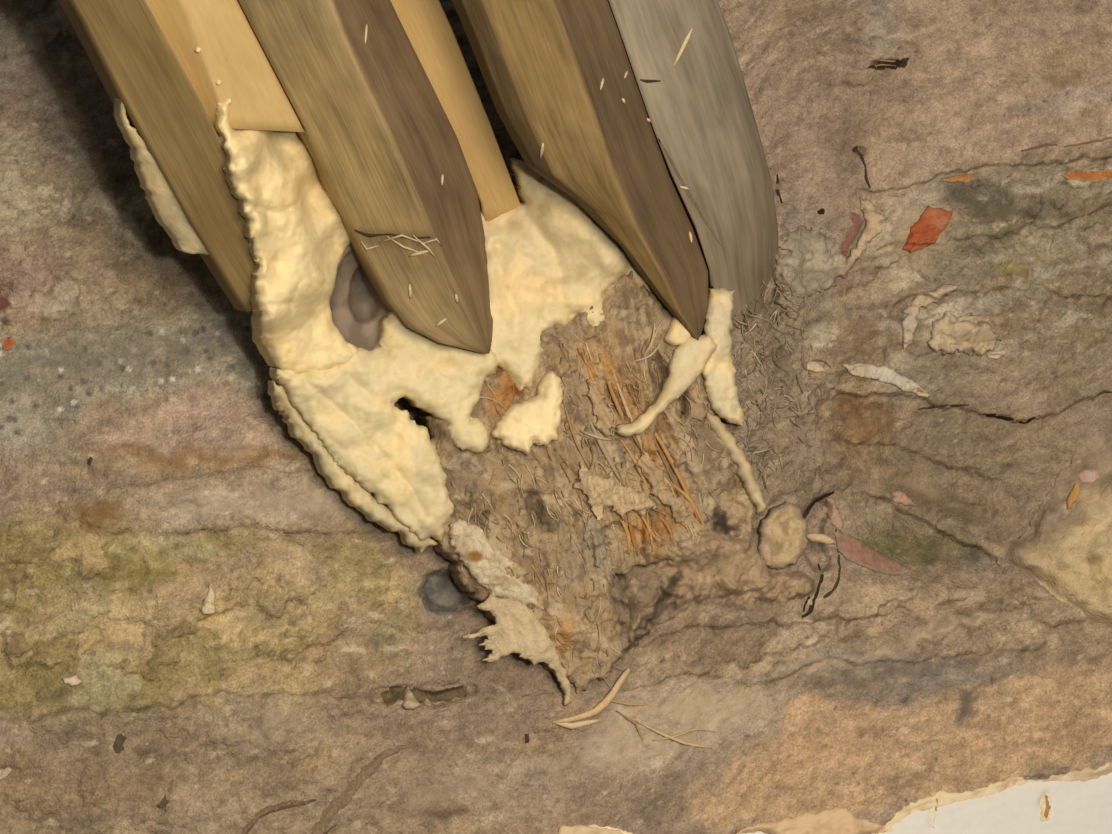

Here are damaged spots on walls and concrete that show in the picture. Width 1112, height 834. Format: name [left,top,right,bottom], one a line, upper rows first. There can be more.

crack [1021,137,1112,152]
crack [918,404,1040,424]
peeling [1039,762,1112,821]
peeling [736,776,1028,834]
peeling [558,824,633,834]